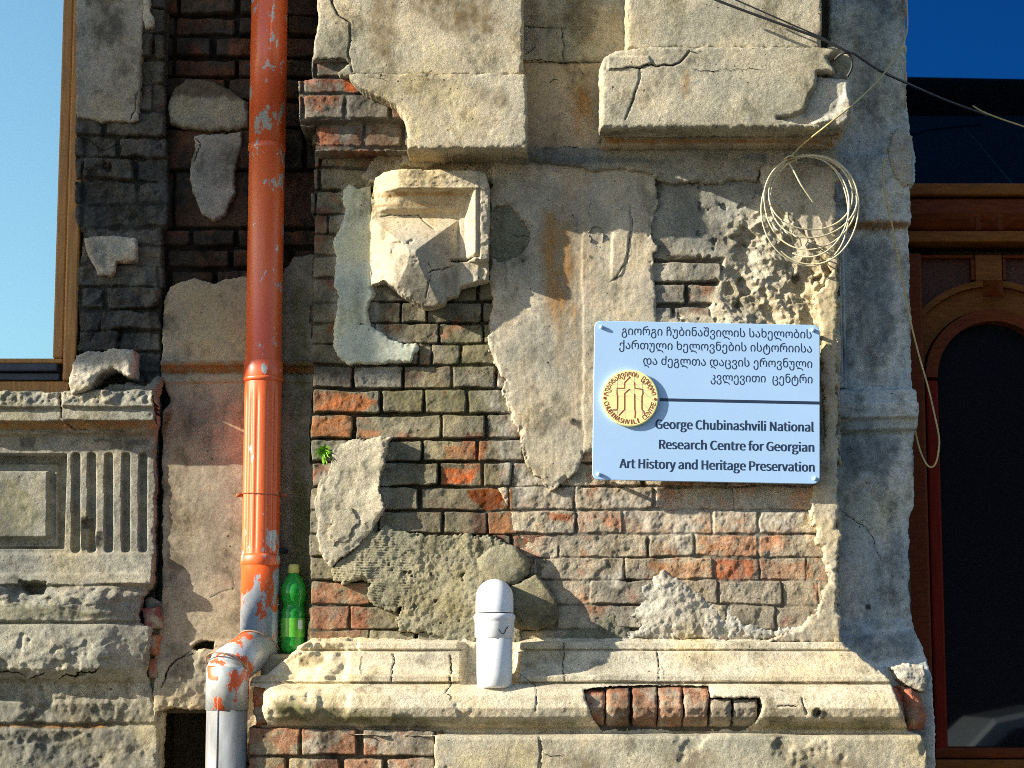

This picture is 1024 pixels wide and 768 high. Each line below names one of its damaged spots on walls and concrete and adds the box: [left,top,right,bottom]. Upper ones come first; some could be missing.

crack [524,26,761,120]
spalling [69,0,251,401]
spalling [283,0,853,641]
spalling [584,685,760,731]
spalling [888,663,927,731]